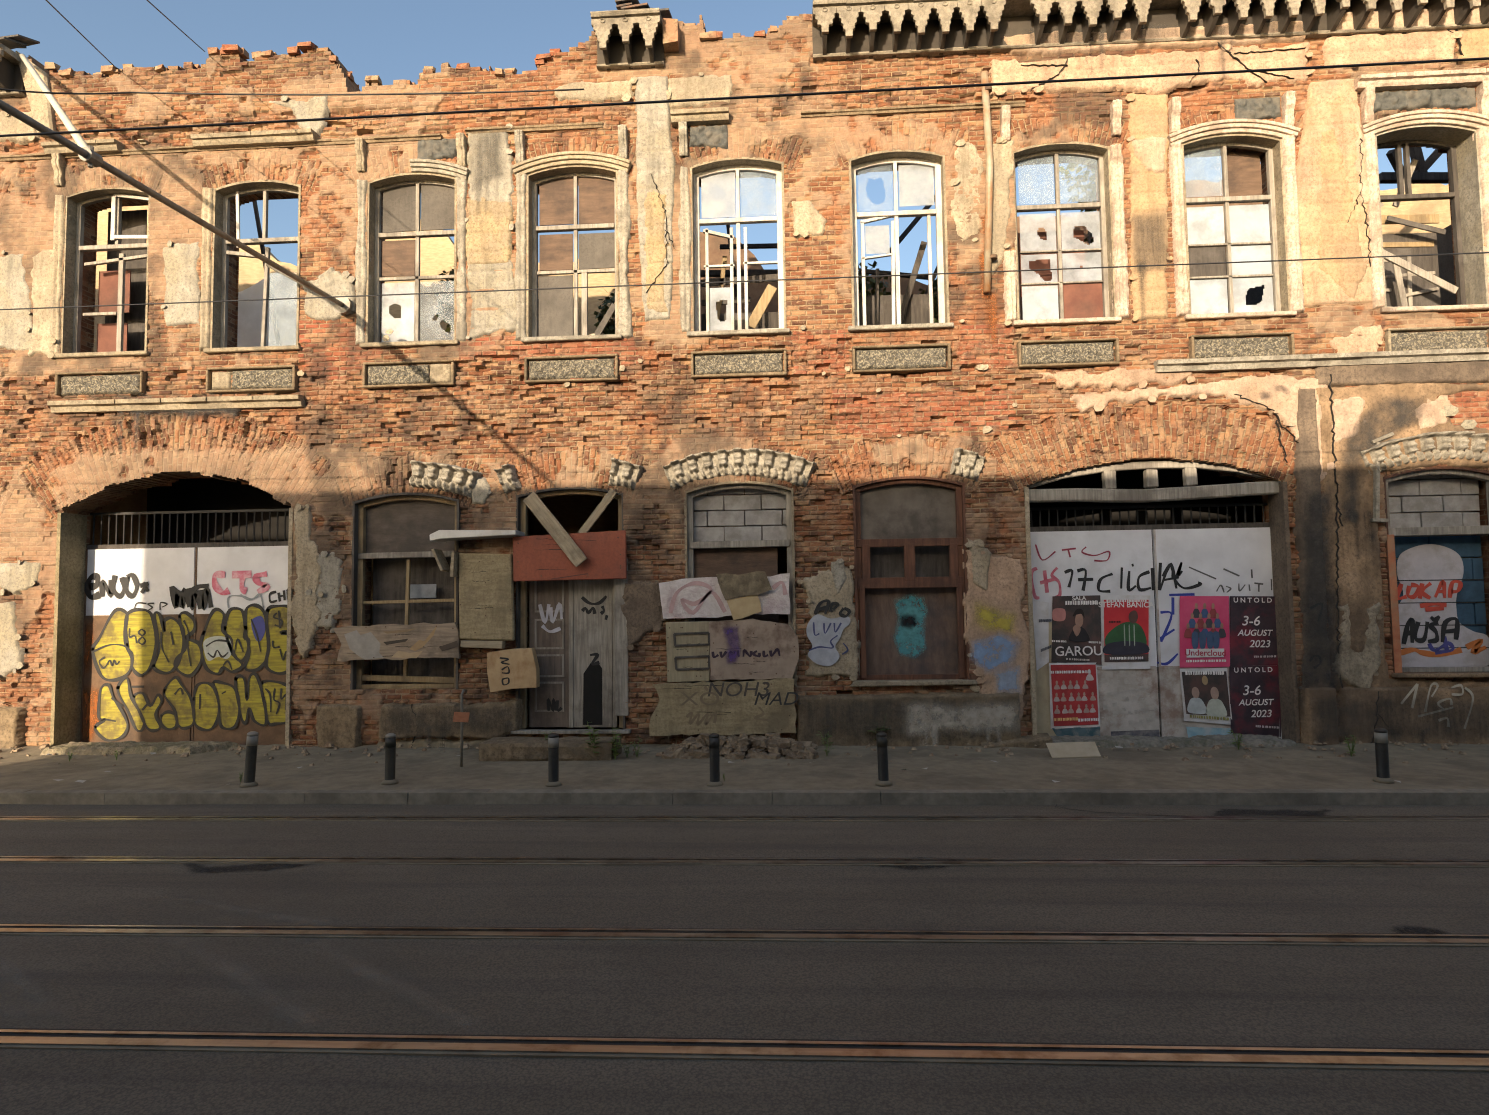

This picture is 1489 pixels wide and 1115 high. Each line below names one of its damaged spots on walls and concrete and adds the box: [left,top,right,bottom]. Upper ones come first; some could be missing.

peeling [0,111,41,145]
peeling [0,250,58,358]
peeling [161,240,201,327]
peeling [269,96,330,137]
spalling [296,267,393,380]
peeling [458,123,644,387]
peeling [554,76,638,103]
peeling [666,72,733,110]
spalling [791,319,1018,437]
peeling [950,136,1015,275]
peeling [1038,367,1365,482]
peeling [989,28,1489,322]